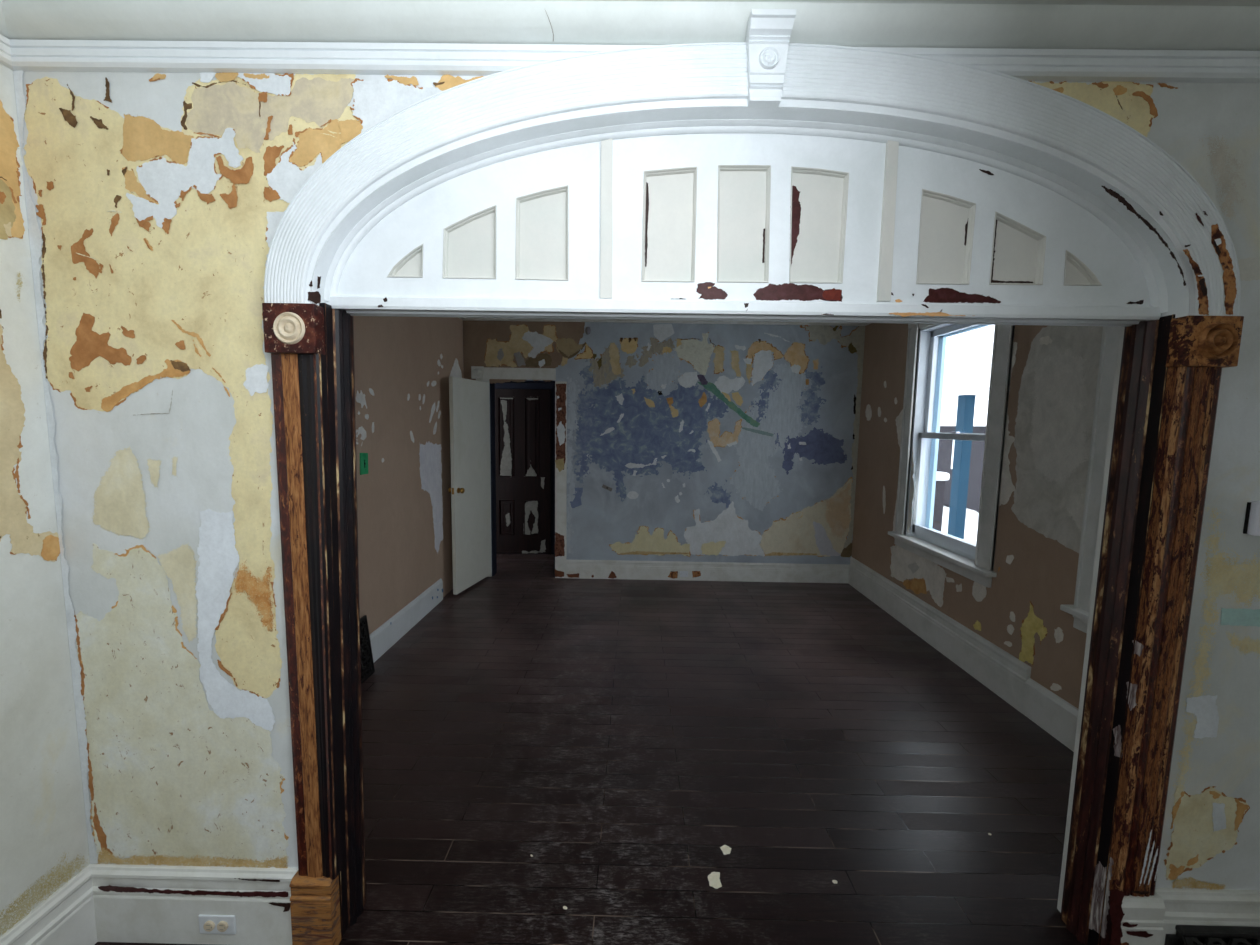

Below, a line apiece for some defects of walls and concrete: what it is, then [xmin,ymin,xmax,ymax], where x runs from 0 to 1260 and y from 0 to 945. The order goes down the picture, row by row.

peeling [1095,82,1178,116]
peeling [120,72,484,248]
peeling [1102,186,1207,296]
peeling [308,276,321,304]
peeling [696,282,728,300]
peeling [744,283,843,315]
peeling [555,383,566,472]
peeling [679,350,853,557]
peeling [500,398,617,579]
peeling [890,545,946,607]
peeling [98,878,290,912]
peeling [1123,922,1153,938]